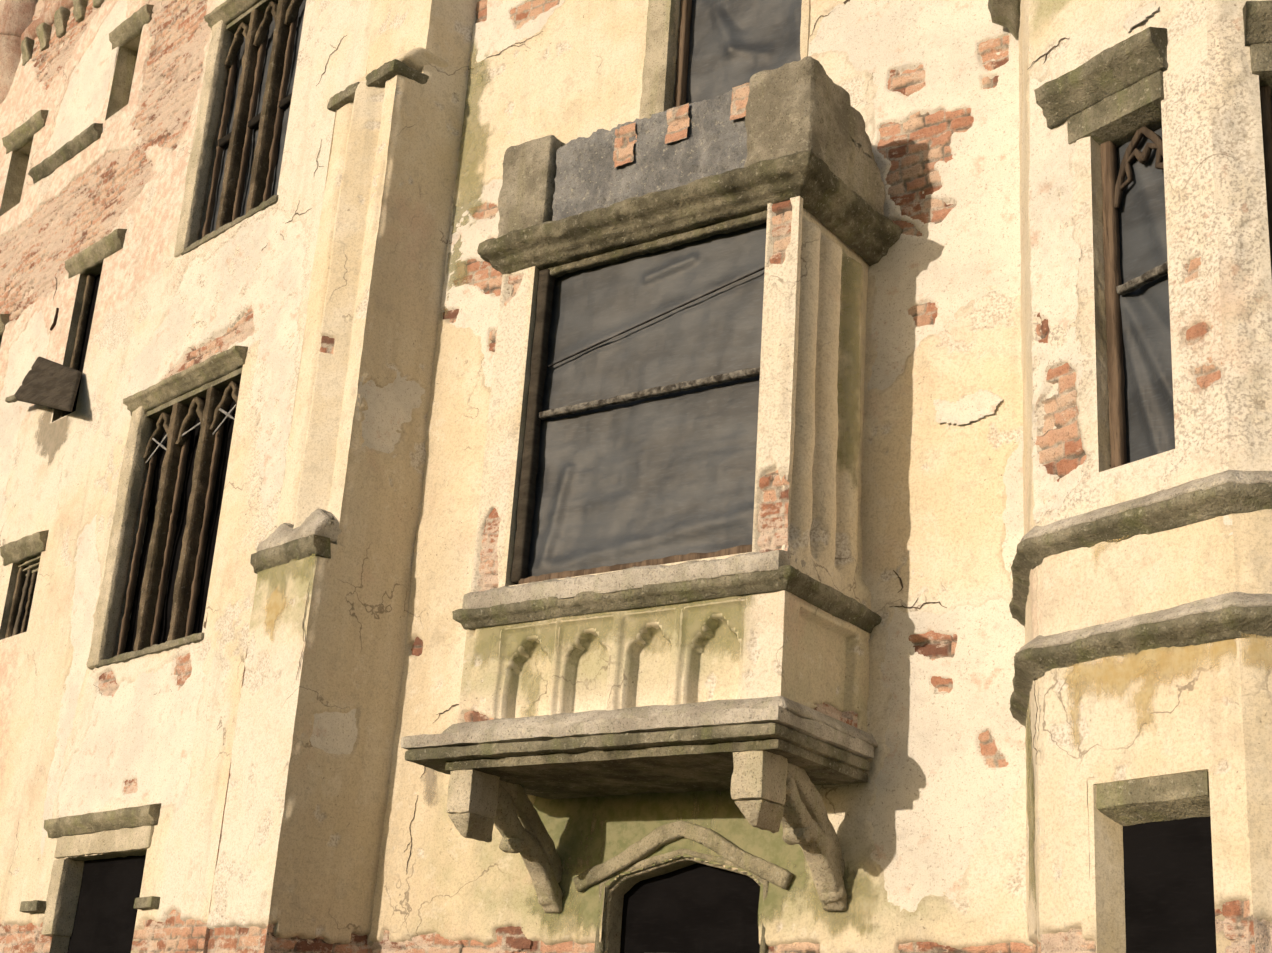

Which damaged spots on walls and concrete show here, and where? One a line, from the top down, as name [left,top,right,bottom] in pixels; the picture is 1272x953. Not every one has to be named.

flaking render [471,0,565,65]
spalling [0,0,211,515]
flaking render [441,179,524,387]
flaking render [808,0,1089,581]
spalling [1186,321,1213,345]
spalling [477,508,501,591]
spalling [757,470,790,558]
crack [891,570,947,609]
crack [404,766,426,875]
flaking render [867,598,1026,912]
damp [1025,708,1036,899]
crack [1031,686,1039,754]